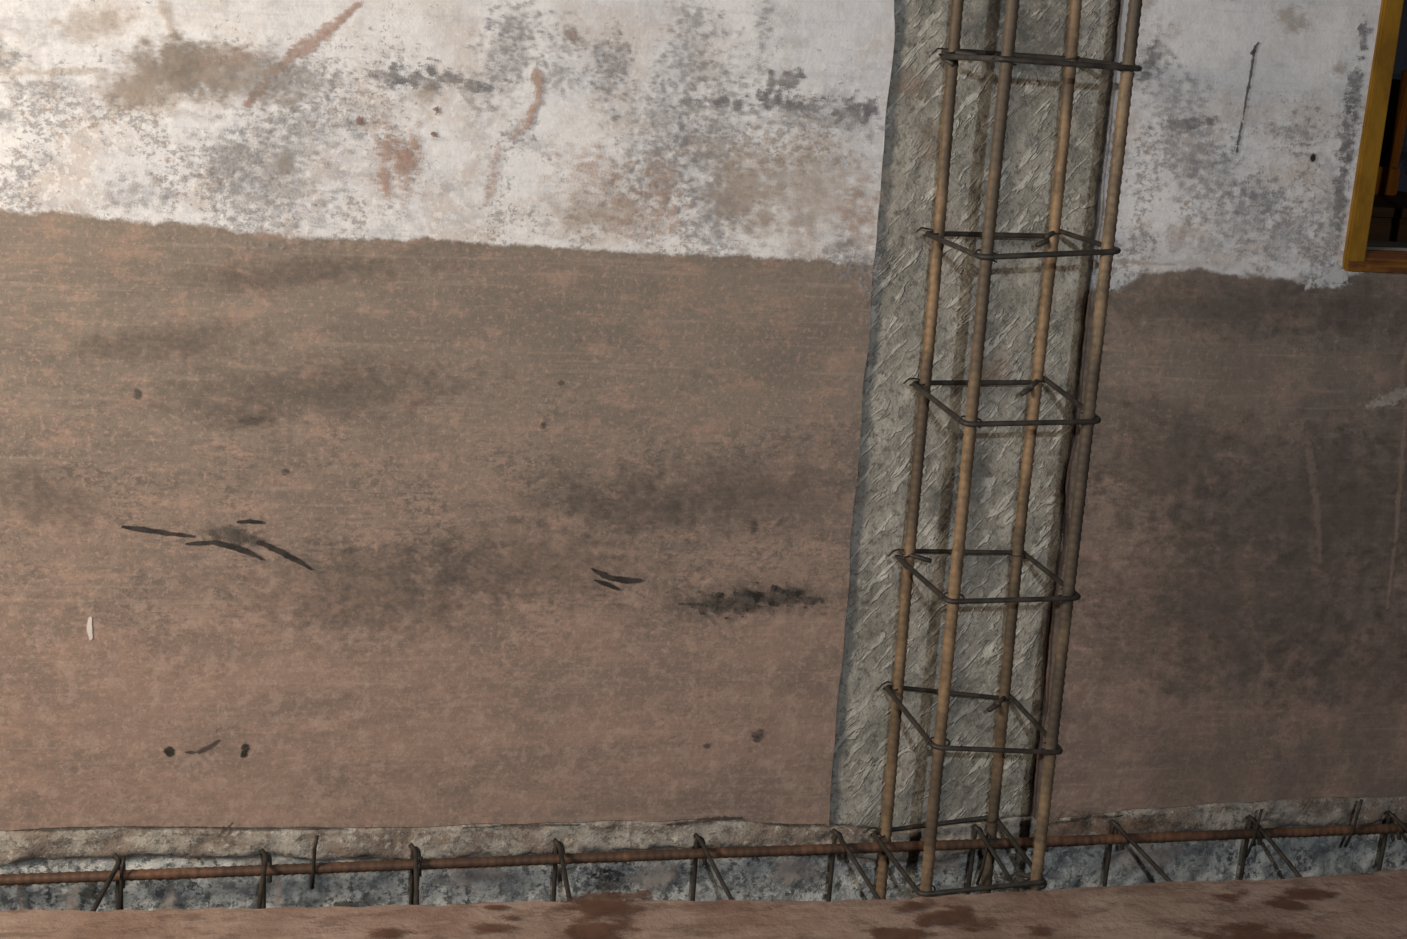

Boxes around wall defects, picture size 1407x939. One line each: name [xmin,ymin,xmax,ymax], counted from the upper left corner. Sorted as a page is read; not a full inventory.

water stain [0,43,67,105]
water stain [108,2,361,108]
water stain [483,68,545,205]
water stain [556,142,679,238]
spalling [0,0,1119,911]
spalling [1041,796,1407,891]